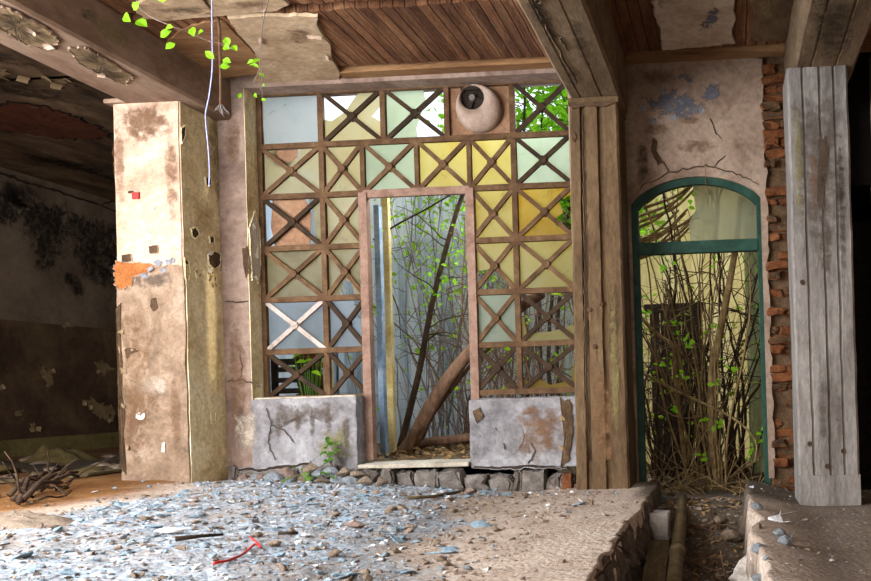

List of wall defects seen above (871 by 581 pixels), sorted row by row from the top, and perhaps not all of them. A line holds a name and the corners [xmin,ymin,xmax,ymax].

peeling [0,5,135,85]
peeling [40,74,83,91]
flaking render [0,100,114,141]
peeling [632,71,720,166]
crack [637,115,759,191]
damp [0,183,117,294]
flaking render [113,226,221,291]
flaking render [756,59,804,490]
crack [227,354,260,387]
crack [238,408,310,473]
rust [523,408,561,447]